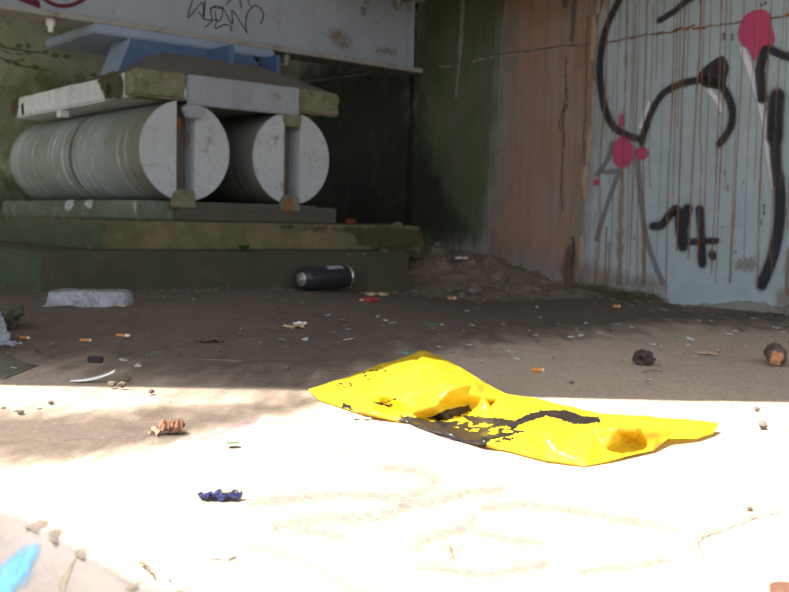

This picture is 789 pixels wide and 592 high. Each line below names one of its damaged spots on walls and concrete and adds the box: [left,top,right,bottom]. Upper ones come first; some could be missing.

crack [0,43,70,71]
rust [97,71,124,100]
rust [11,96,24,118]
crack [405,3,743,226]
rust [492,0,772,298]